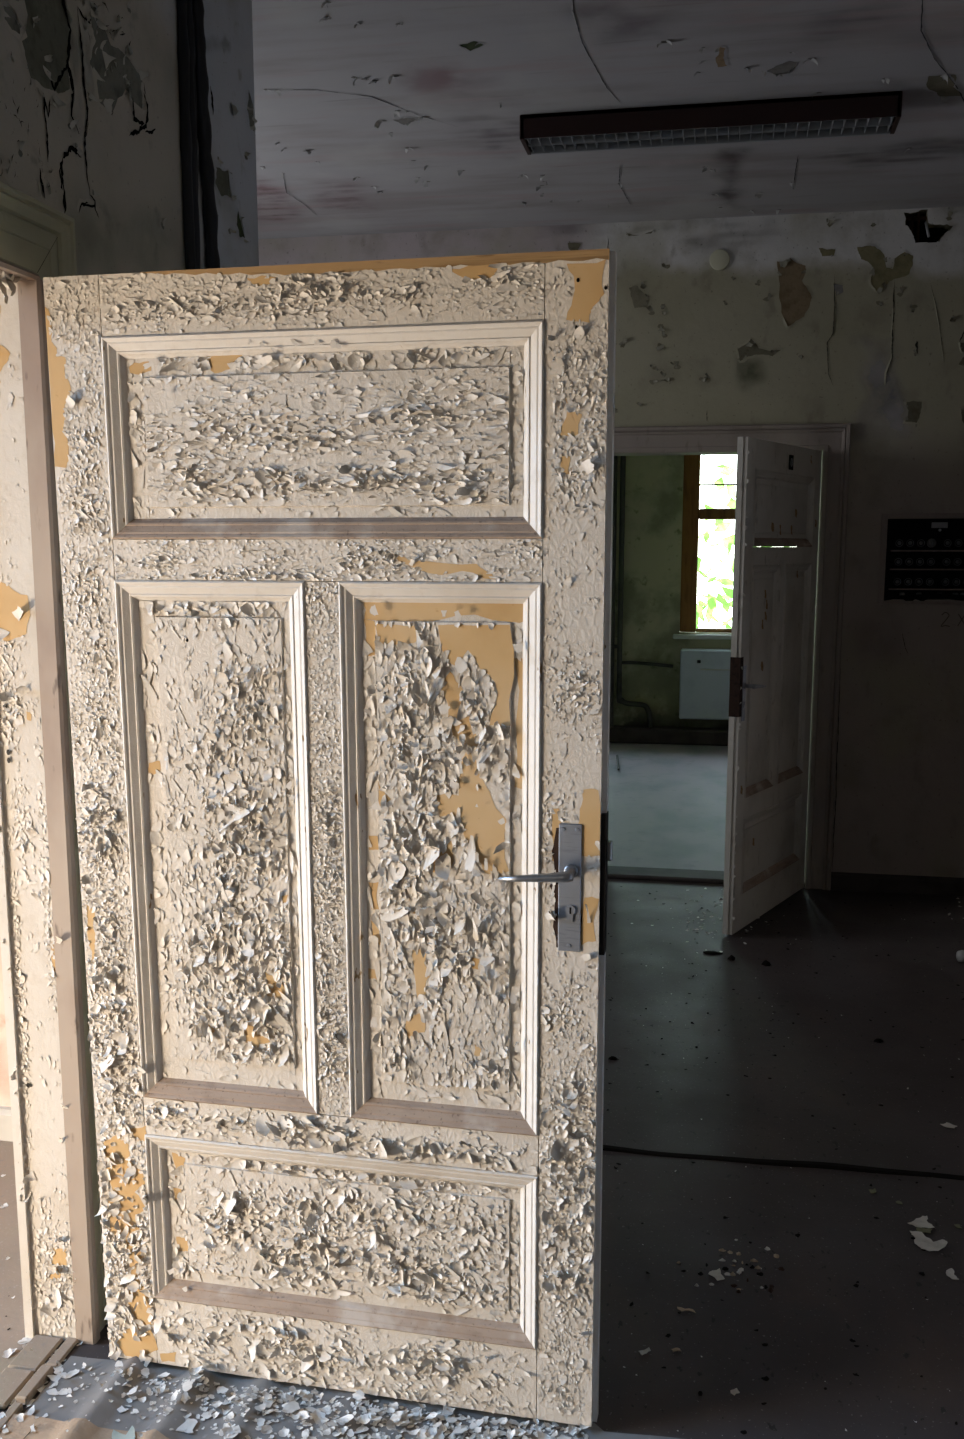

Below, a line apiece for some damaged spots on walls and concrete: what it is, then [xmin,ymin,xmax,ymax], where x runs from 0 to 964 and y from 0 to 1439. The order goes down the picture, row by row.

peeling [0,0,84,155]
crack [0,0,155,218]
peeling [87,1,149,116]
peeling [231,87,271,133]
peeling [459,41,487,52]
crack [571,0,620,102]
crack [920,0,964,101]
peeling [215,157,248,243]
peeling [755,256,815,330]
peeling [855,208,958,306]
peeling [43,240,627,1439]
peeling [0,539,76,1339]